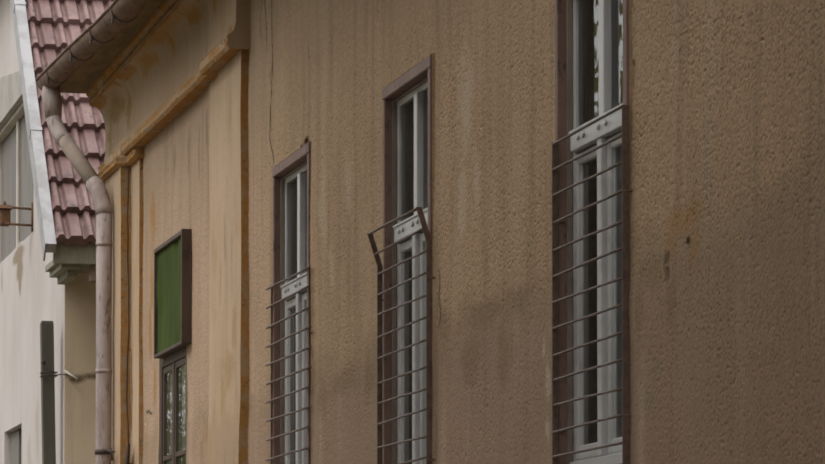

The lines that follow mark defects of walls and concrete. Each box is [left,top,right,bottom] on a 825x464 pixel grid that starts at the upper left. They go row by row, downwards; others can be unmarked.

crack [259,0,274,160]